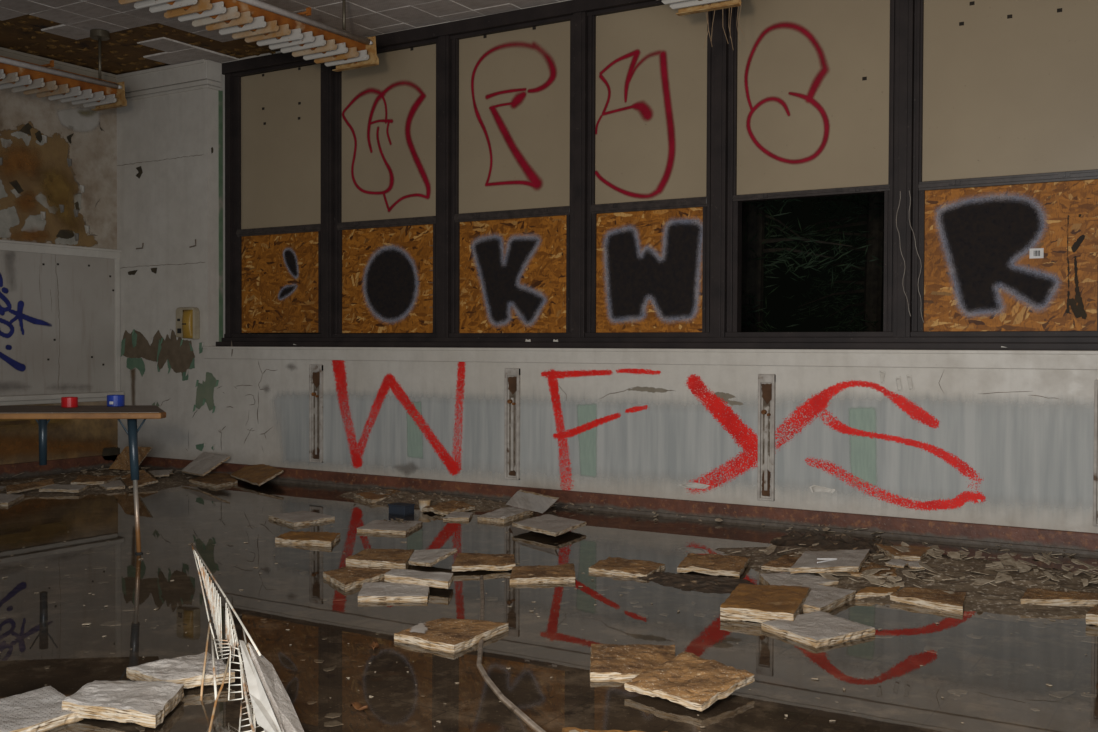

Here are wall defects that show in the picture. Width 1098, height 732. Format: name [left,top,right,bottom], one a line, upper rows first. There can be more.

flaking render [0,121,98,247]
peeling [121,329,219,413]